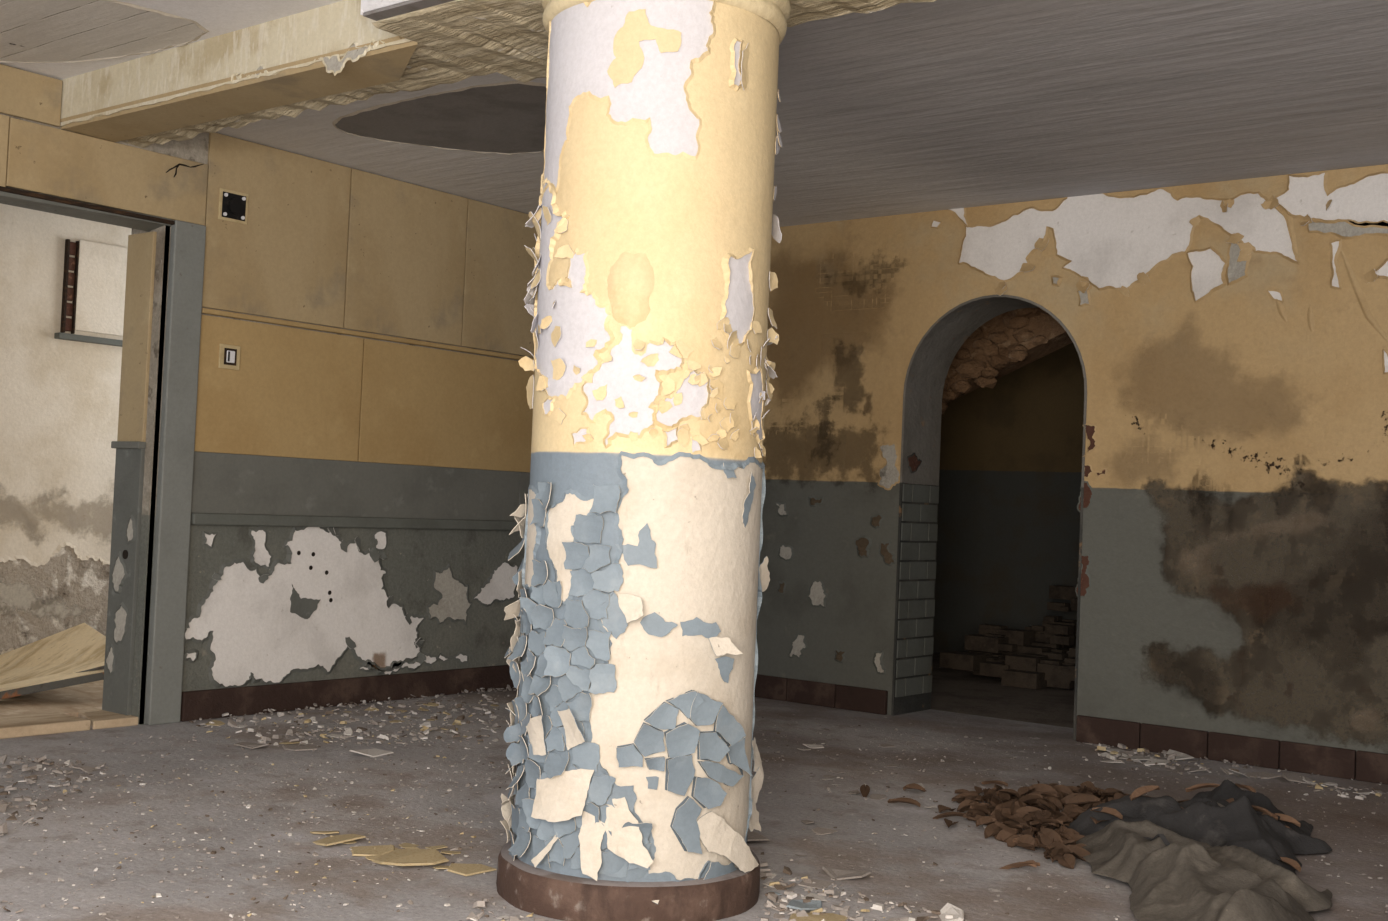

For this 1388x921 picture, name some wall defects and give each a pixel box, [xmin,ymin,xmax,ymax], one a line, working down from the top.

peeling [184,0,794,882]
spalling [942,308,1073,414]
peeling [931,171,1388,307]
damp [1143,439,1388,745]